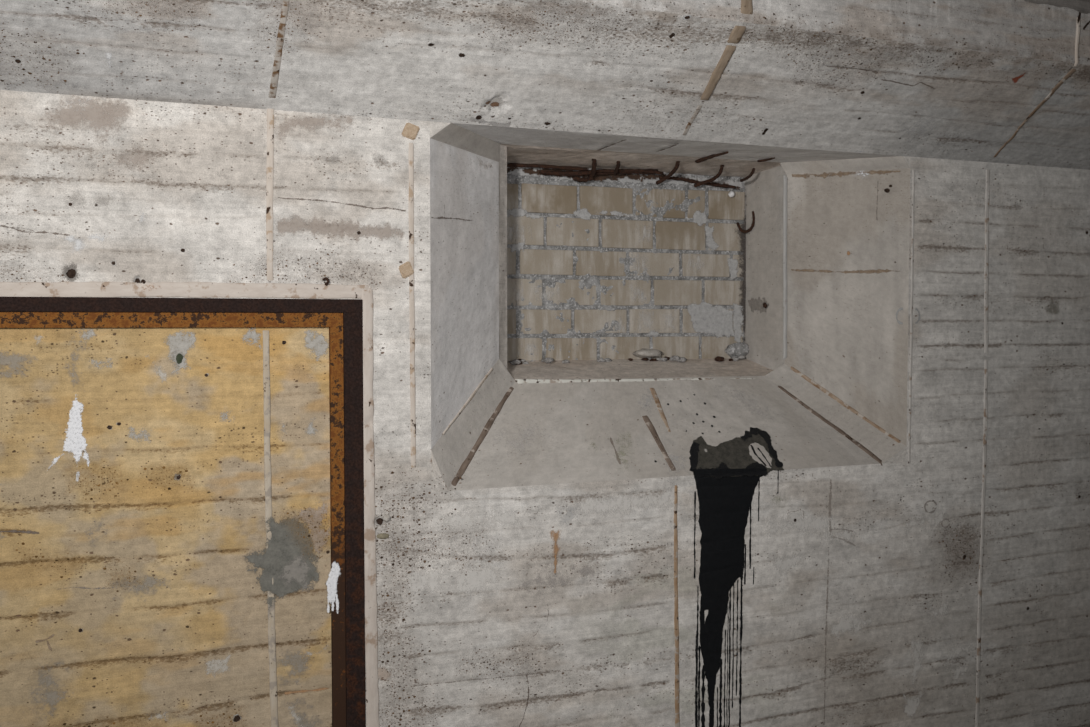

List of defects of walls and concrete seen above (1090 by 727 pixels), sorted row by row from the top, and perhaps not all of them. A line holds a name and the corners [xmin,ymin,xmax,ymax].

crack [278,197,405,211]
rust [551,530,559,573]